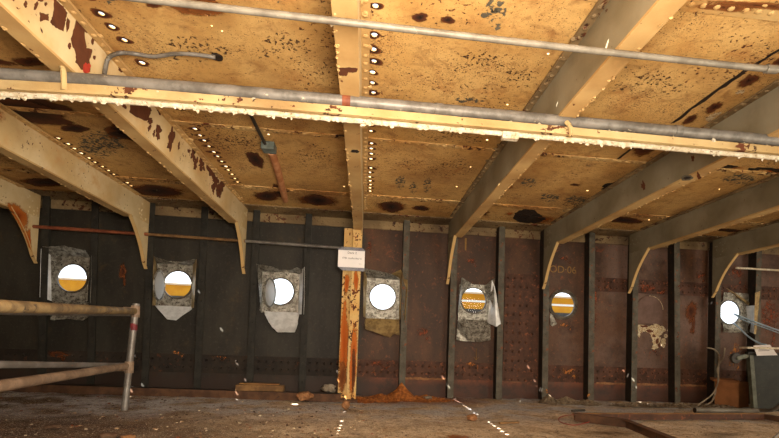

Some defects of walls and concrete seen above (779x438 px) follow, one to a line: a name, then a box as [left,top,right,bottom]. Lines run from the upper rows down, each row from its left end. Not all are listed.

corrosion [90,0,134,44]
corrosion [146,3,202,16]
peeling [24,0,96,73]
peeling [327,118,502,143]
peeling [49,97,254,198]
corrosion [298,194,338,206]
corrosion [377,201,429,213]
corrosion [506,209,553,223]
corrosion [338,271,359,396]
peeling [638,324,668,350]